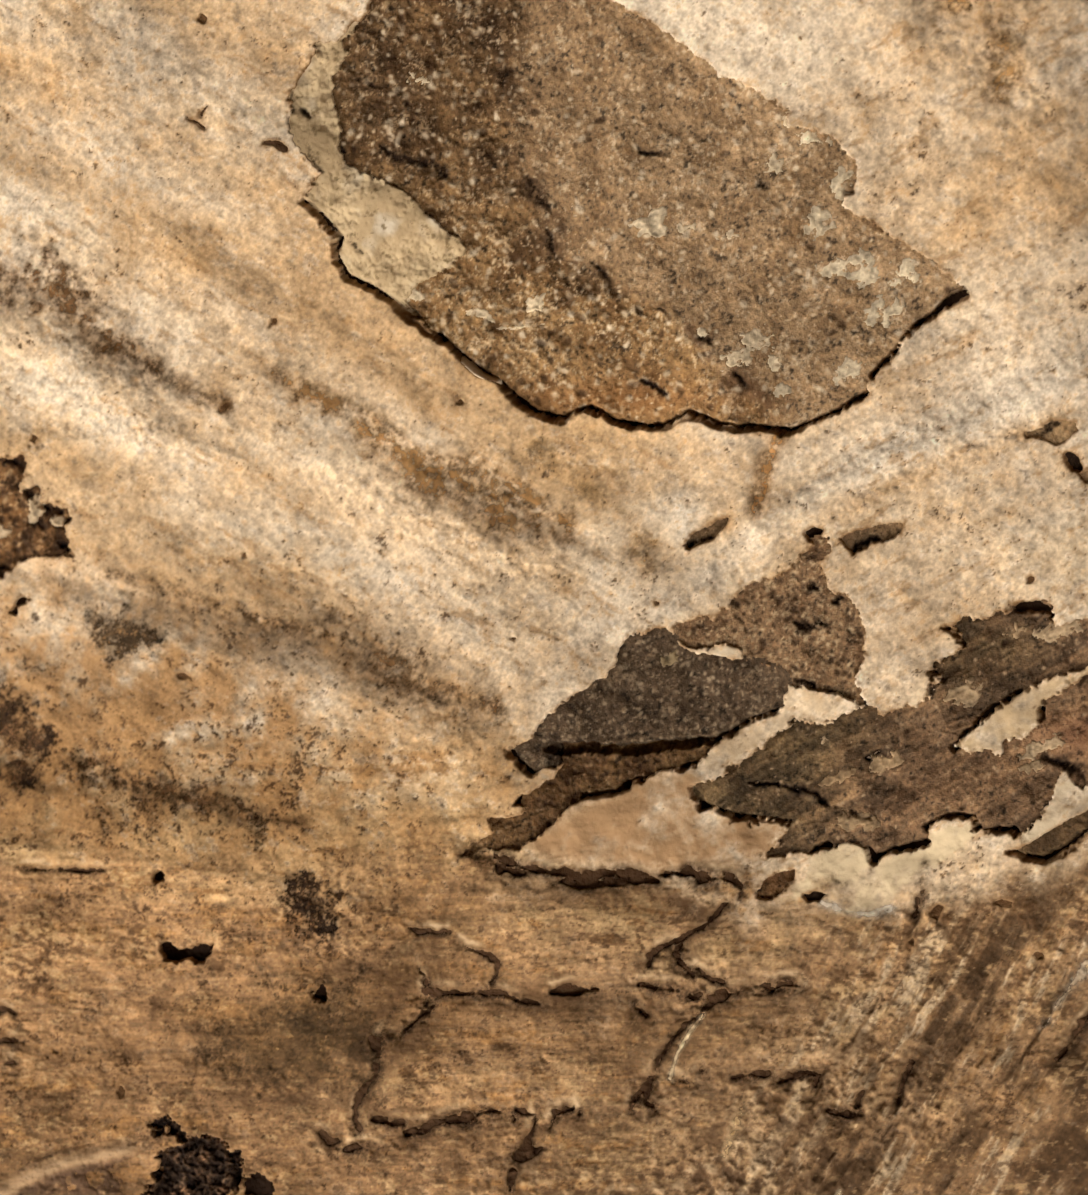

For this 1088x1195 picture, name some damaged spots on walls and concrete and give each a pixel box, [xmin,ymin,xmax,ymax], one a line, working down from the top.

spalling [289,0,964,429]
spalling [1025,420,1088,482]
spalling [0,455,74,578]
peeling [465,523,1088,899]
crack [911,897,921,920]
crack [317,848,865,1194]
crack [1054,1014,1088,1062]
crack [894,1059,916,1106]
spalling [141,1114,248,1195]